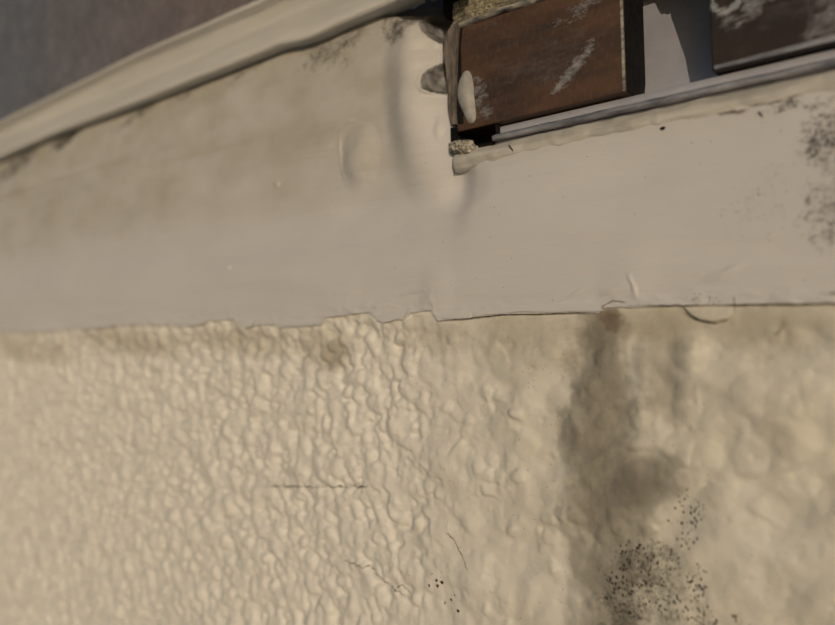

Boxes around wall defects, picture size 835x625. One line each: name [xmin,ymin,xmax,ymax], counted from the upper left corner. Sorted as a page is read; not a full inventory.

water stain [777,95,835,164]
peeling [440,303,603,319]
peeling [685,306,734,321]
water stain [571,315,717,625]